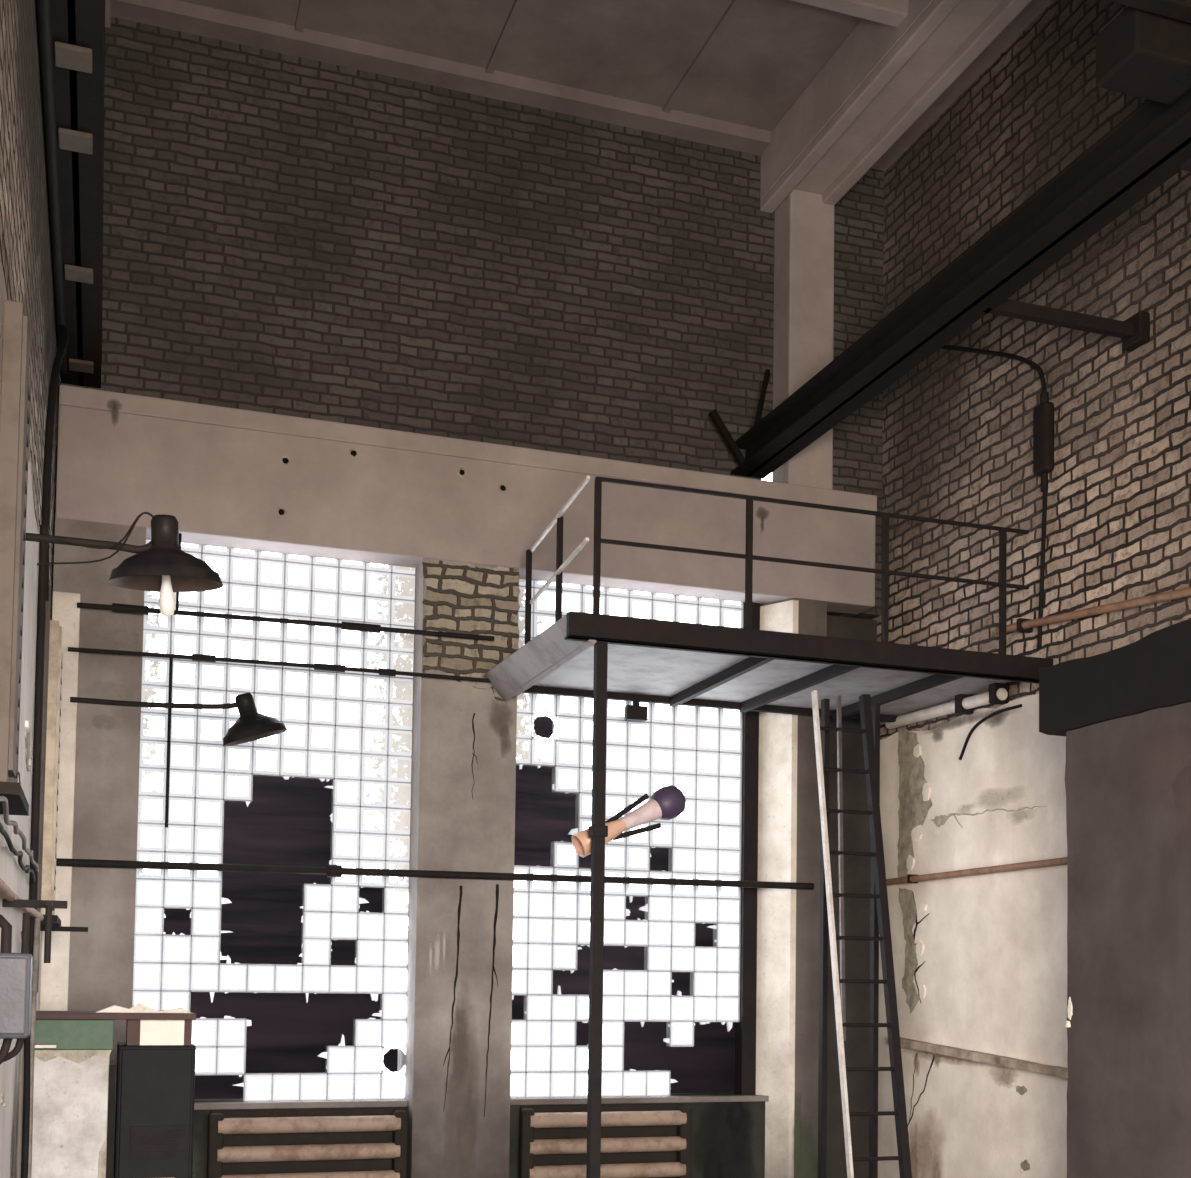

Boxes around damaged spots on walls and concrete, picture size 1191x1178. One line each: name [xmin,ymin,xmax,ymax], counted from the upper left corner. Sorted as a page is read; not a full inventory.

flaking render [897,726,952,1014]
crack [931,806,1047,828]
crack [443,886,462,1111]
crack [484,884,499,1117]